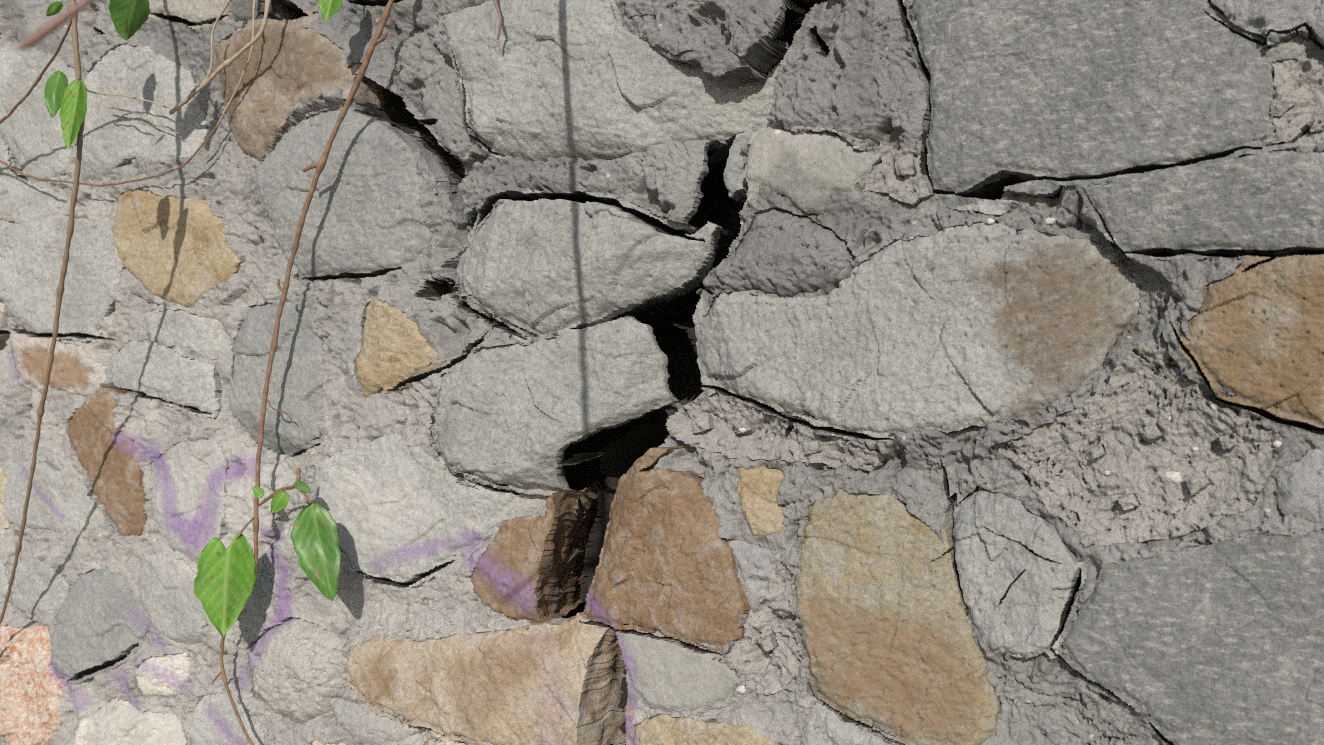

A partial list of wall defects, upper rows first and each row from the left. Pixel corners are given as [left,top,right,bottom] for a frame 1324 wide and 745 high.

crack [786,3,820,13]
crack [897,0,1324,273]
crack [480,192,745,246]
crack [644,303,894,440]
crack [562,418,721,737]